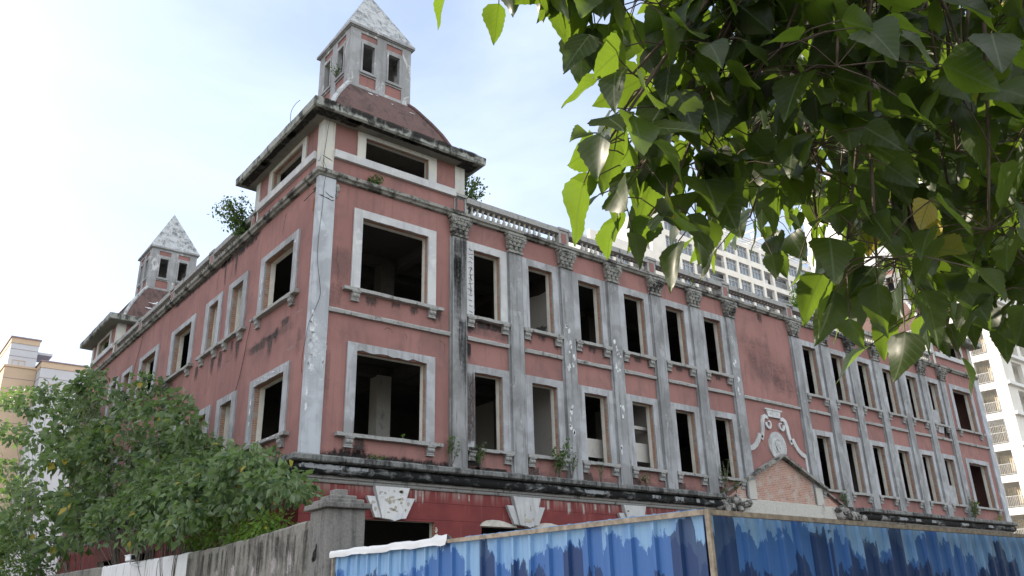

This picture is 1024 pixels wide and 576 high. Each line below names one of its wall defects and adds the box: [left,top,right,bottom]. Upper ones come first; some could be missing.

water stain [211,316,289,371]
peeling [308,310,324,372]
water stain [468,447,507,472]